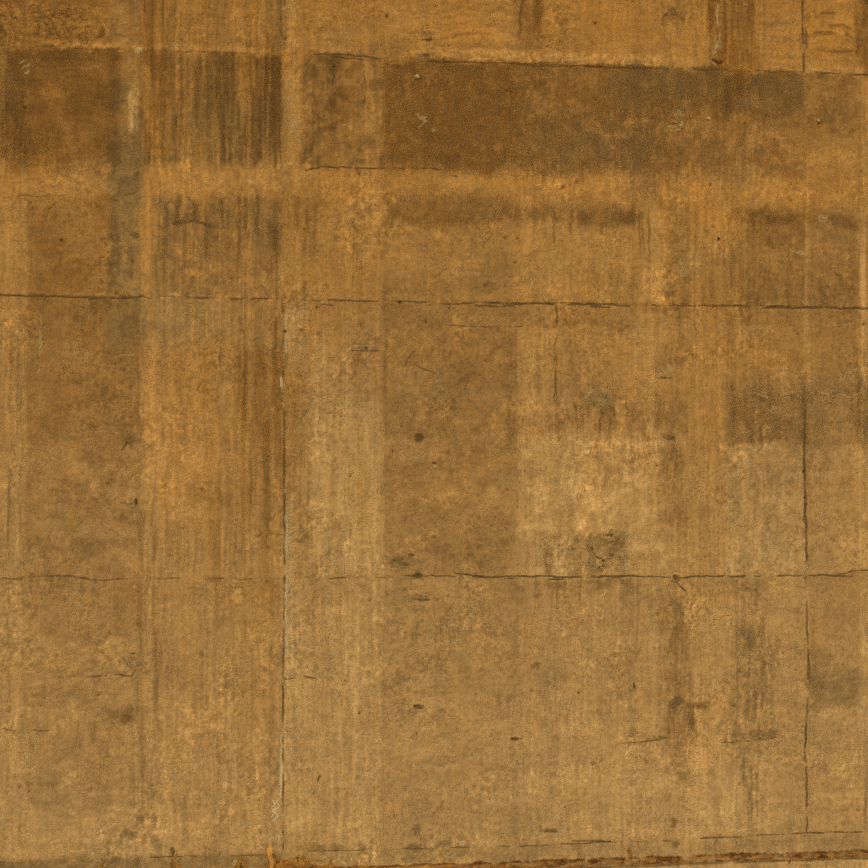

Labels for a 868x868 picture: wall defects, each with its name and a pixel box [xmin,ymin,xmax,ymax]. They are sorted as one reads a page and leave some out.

crack [760,712,856,835]
rust [262,849,868,868]